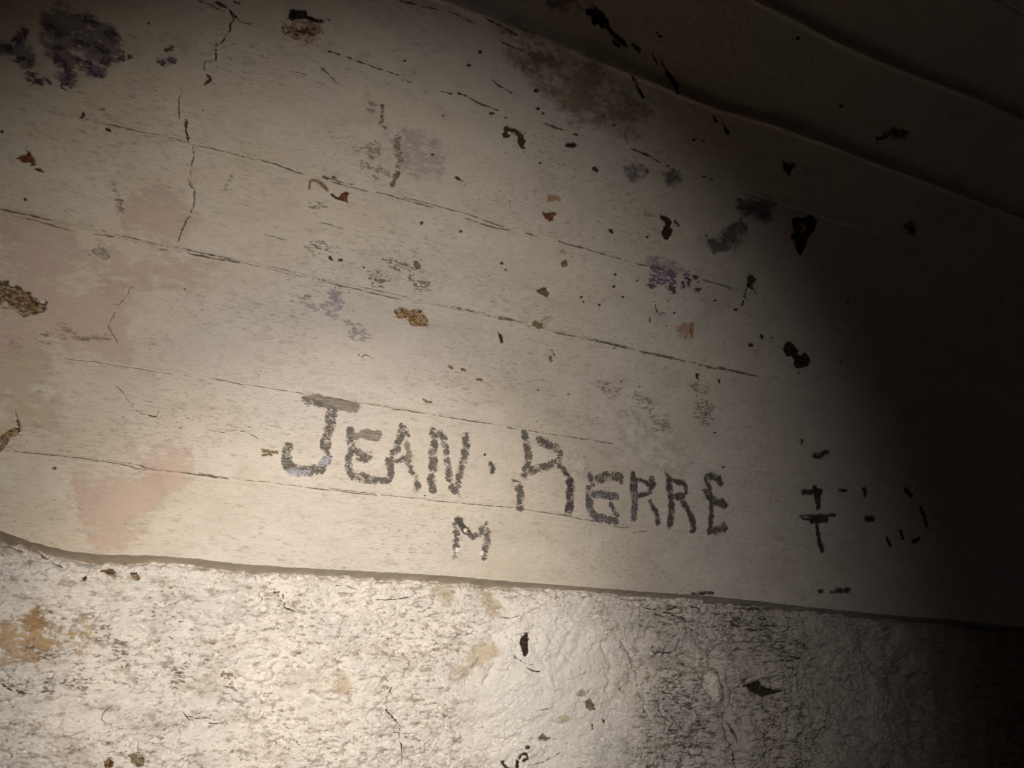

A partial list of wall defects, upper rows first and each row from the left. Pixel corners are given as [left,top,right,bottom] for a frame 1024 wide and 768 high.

damp [0,2,133,91]
spalling [489,112,526,149]
crack [86,0,670,323]
crack [630,148,714,181]
crack [0,209,66,230]
spalling [646,211,680,240]
spalling [791,214,820,256]
spalling [0,280,48,317]
spalling [392,305,429,328]
crack [554,332,759,377]
spalling [748,334,811,373]
spalling [520,630,529,657]